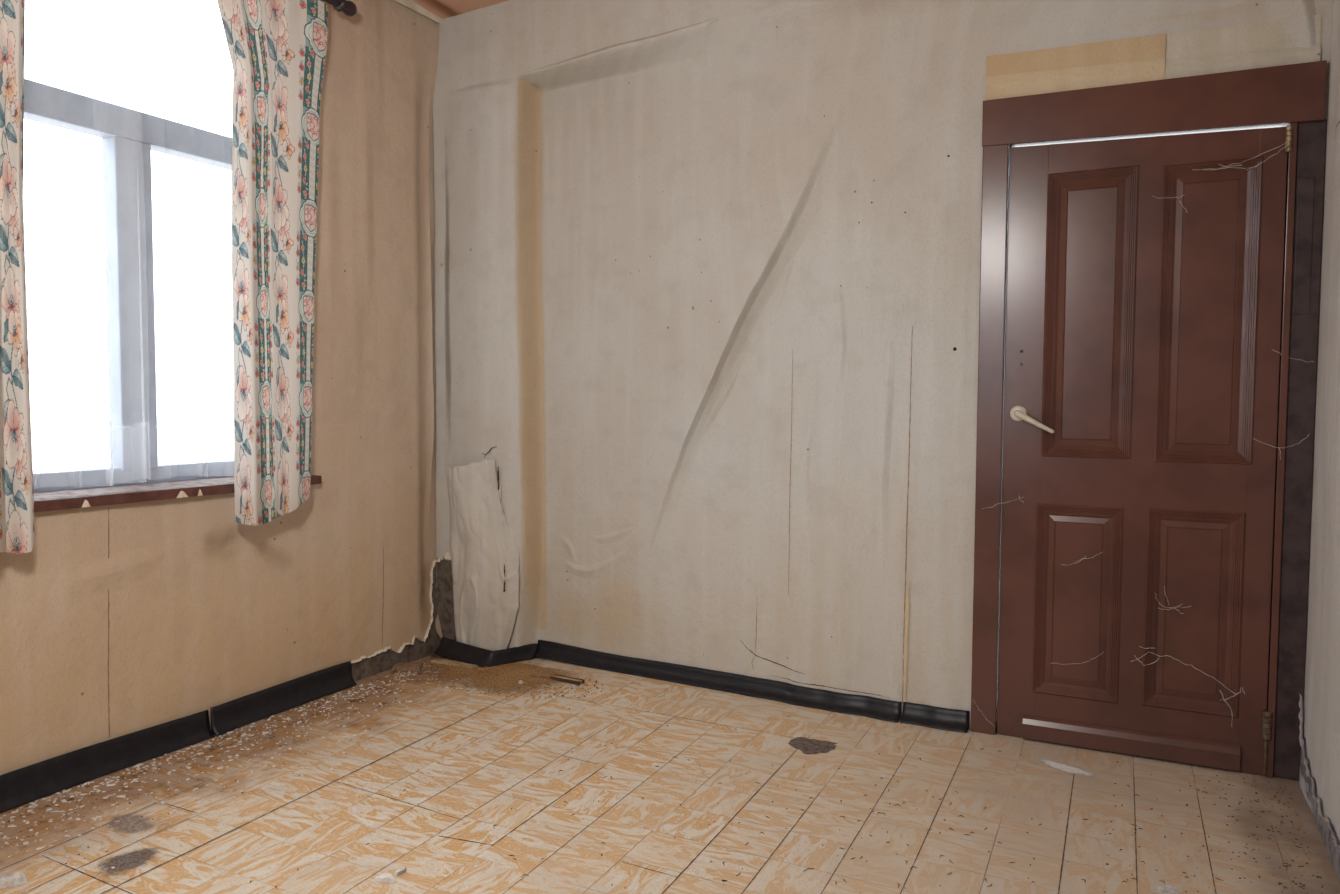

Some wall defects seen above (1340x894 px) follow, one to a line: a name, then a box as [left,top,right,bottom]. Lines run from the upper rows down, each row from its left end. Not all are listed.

peeling [0,559,530,859]
peeling [1298,693,1340,883]